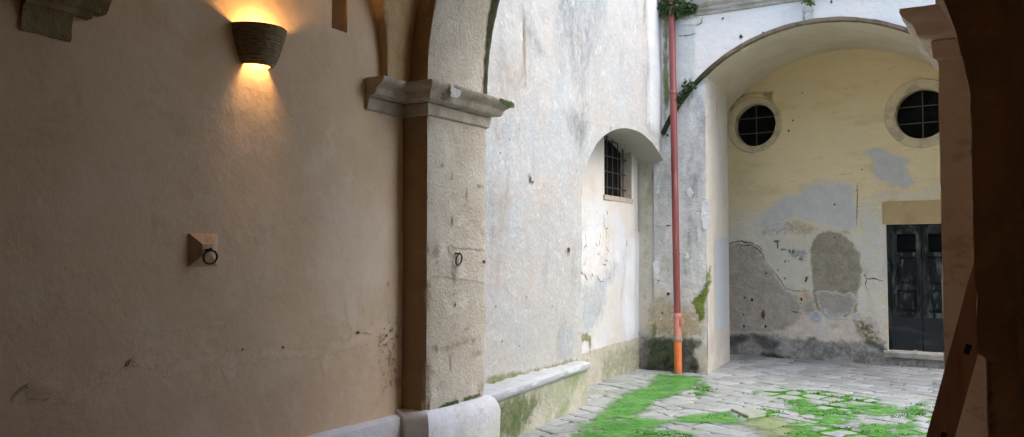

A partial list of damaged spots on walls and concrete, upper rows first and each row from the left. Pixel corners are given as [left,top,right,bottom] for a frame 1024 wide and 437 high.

leakage [583,229,702,346]
flaking render [686,181,941,335]
leakage [730,330,944,369]